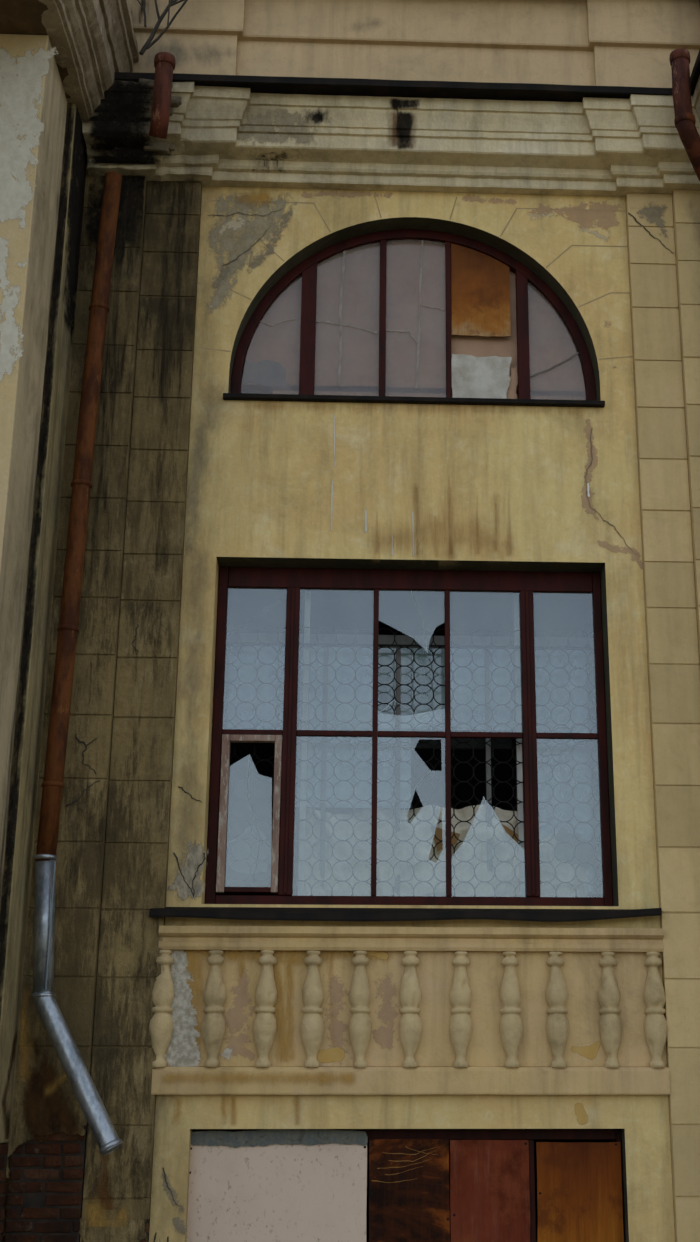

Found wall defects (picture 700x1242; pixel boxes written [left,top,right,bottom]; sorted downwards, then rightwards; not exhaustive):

peeling [0,46,59,229]
peeling [0,237,28,381]
flaking render [207,192,292,314]
crack [65,734,100,807]
peeling [164,950,201,1067]
flaking render [0,1125,169,1242]